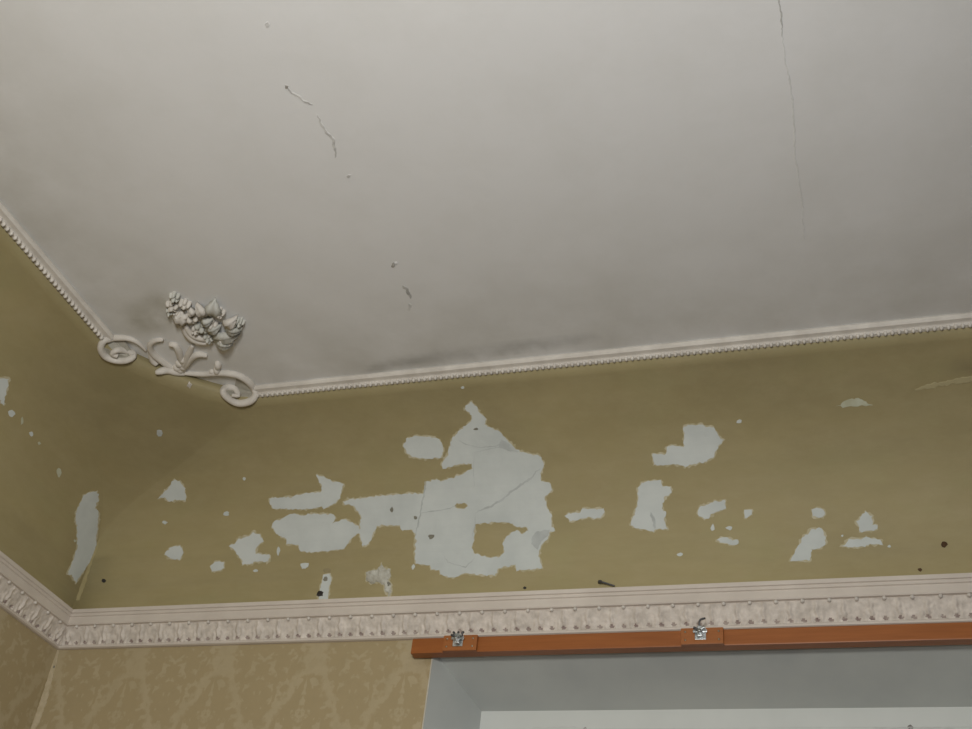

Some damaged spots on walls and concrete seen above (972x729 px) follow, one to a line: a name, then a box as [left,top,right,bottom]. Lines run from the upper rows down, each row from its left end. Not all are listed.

crack [285,85,351,178]
peeling [0,376,41,445]
peeling [651,422,725,469]
peeling [66,490,101,584]
peeling [158,478,187,503]
peeling [229,400,555,579]
peeling [565,507,605,523]
peeling [629,479,673,533]
peeling [696,499,739,546]
peeling [788,507,828,562]
peeling [840,510,891,549]
peeling [210,560,225,573]